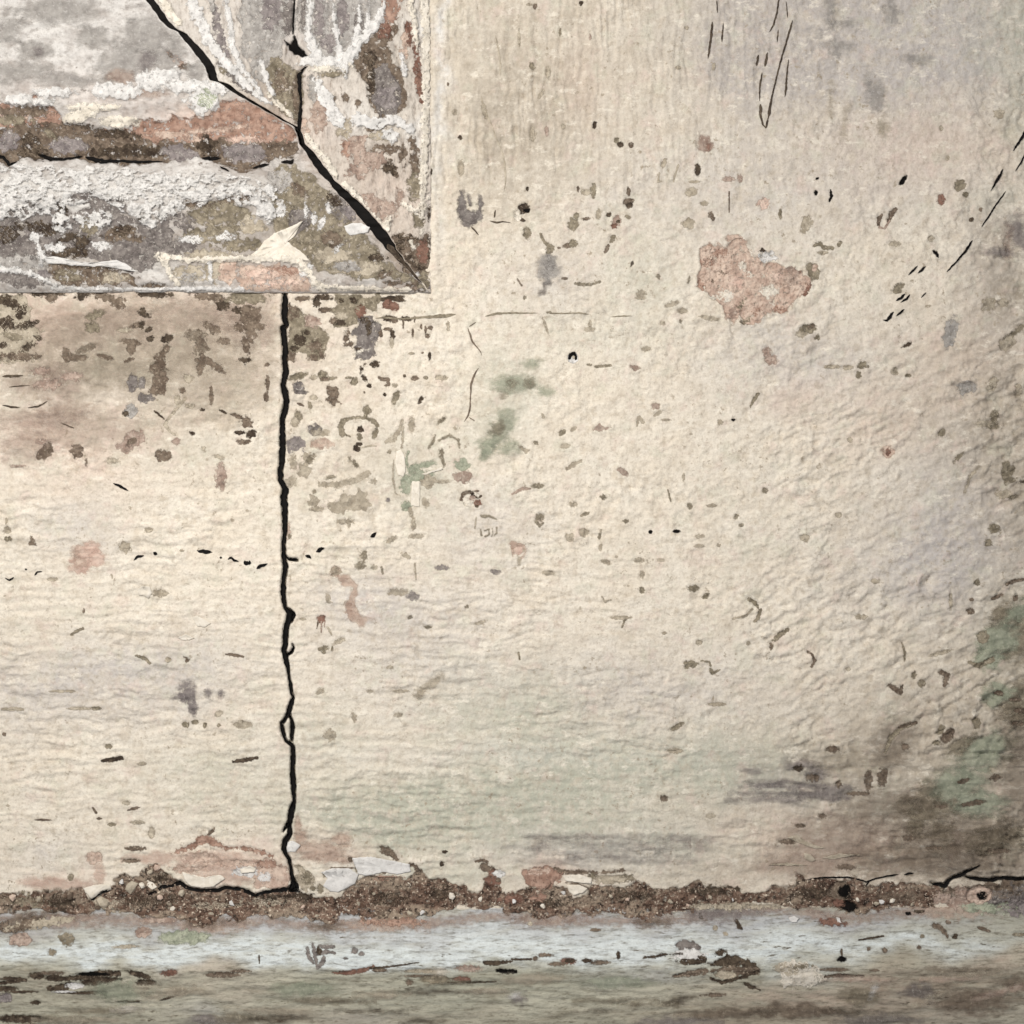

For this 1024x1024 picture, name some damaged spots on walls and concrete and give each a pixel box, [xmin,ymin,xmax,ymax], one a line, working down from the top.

crack [0,154,162,166]
crack [146,0,419,280]
peeling [0,0,497,539]
flaking render [665,234,842,325]
crack [149,293,324,896]
leakage [974,603,1024,728]
spalling [0,801,1024,956]
leakage [754,760,849,802]
crack [808,865,1024,888]
leakage [899,734,1015,841]
leakage [966,824,1024,855]
spalling [819,949,879,978]